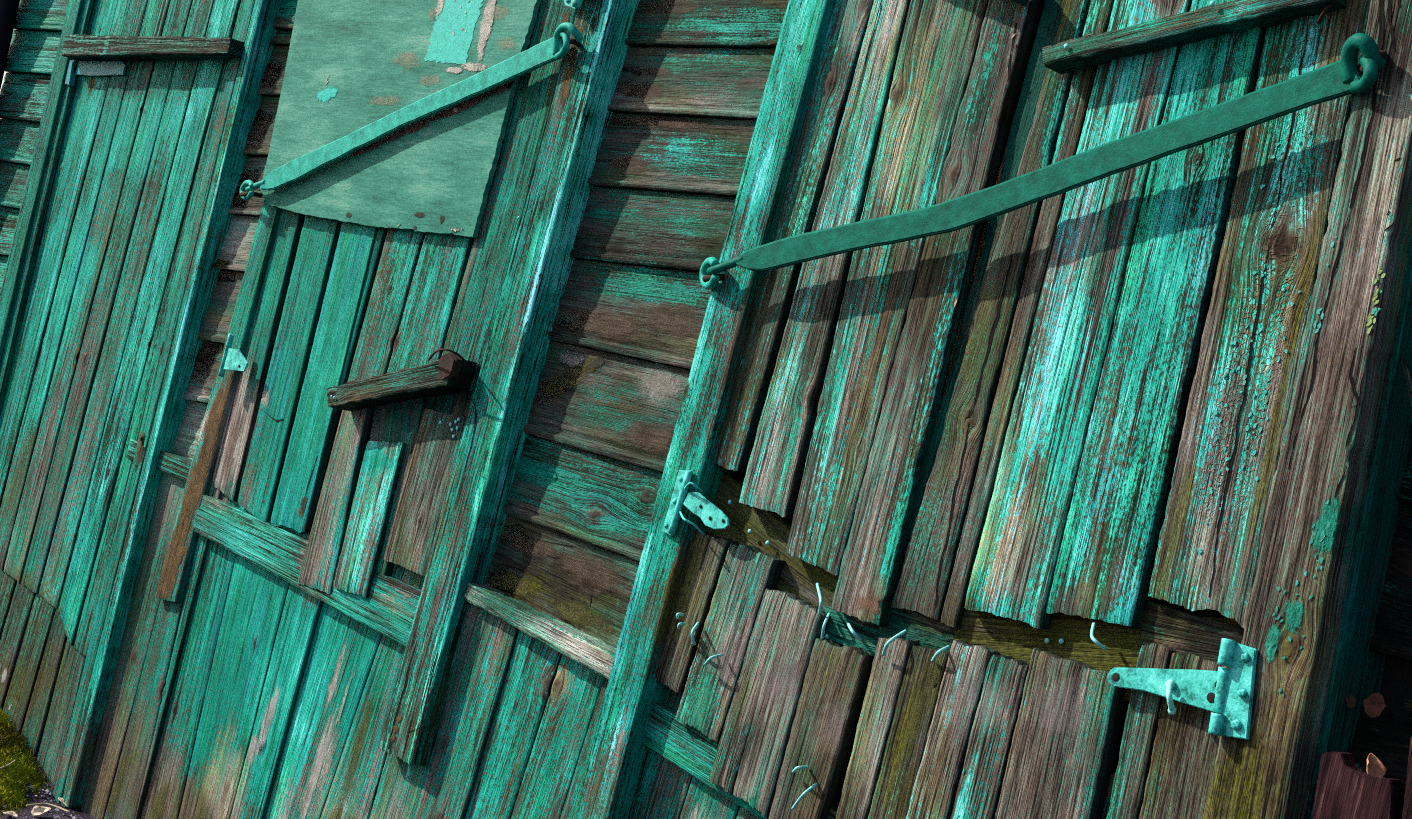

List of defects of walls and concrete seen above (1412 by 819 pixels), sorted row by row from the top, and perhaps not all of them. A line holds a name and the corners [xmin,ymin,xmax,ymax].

peeling [424,0,496,74]
spalling [388,212,463,231]
peeling [1260,129,1312,190]
spalling [940,227,985,408]
peeling [1230,288,1301,362]
peeling [1366,268,1386,334]
peeling [1206,366,1270,524]
peeling [1265,497,1340,662]
peeling [223,687,279,818]
peeling [281,647,353,819]